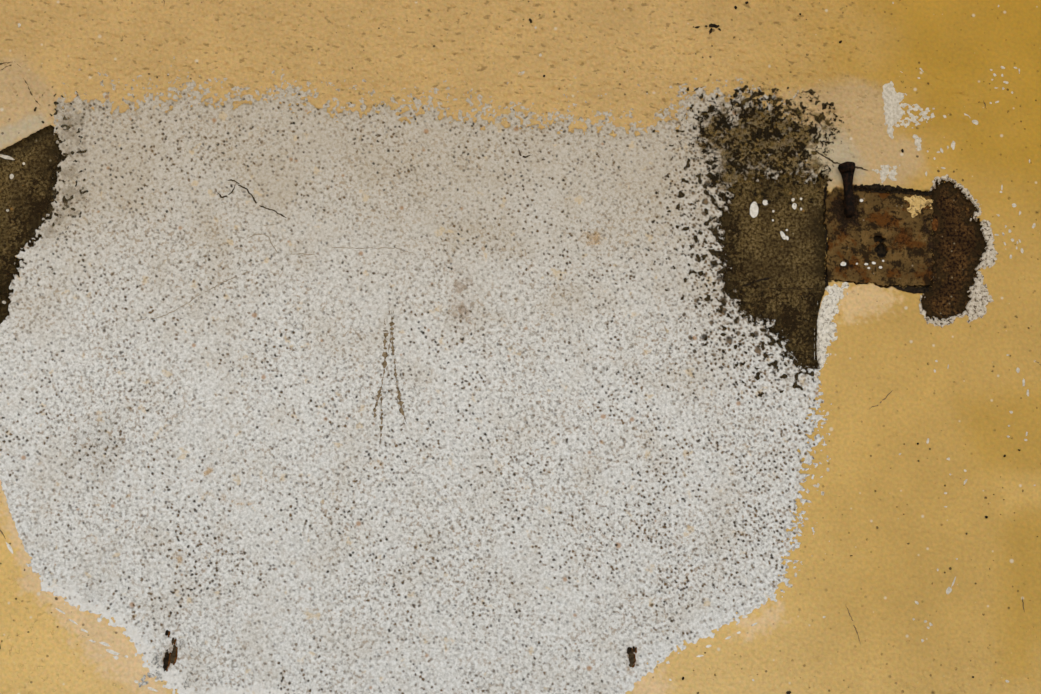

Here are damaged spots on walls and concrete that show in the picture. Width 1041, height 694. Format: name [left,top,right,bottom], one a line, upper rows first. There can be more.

peeling [0,56,849,694]
corrosion [829,191,865,235]